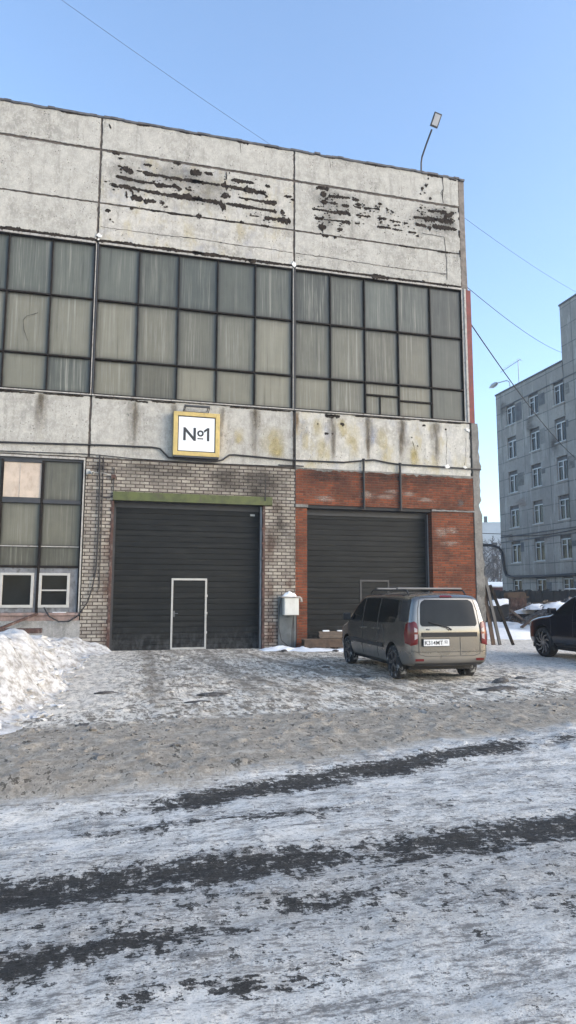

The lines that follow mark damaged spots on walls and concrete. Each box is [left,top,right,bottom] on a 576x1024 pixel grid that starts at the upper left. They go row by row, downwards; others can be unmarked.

peeling [104,150,295,228]
peeling [312,174,460,255]